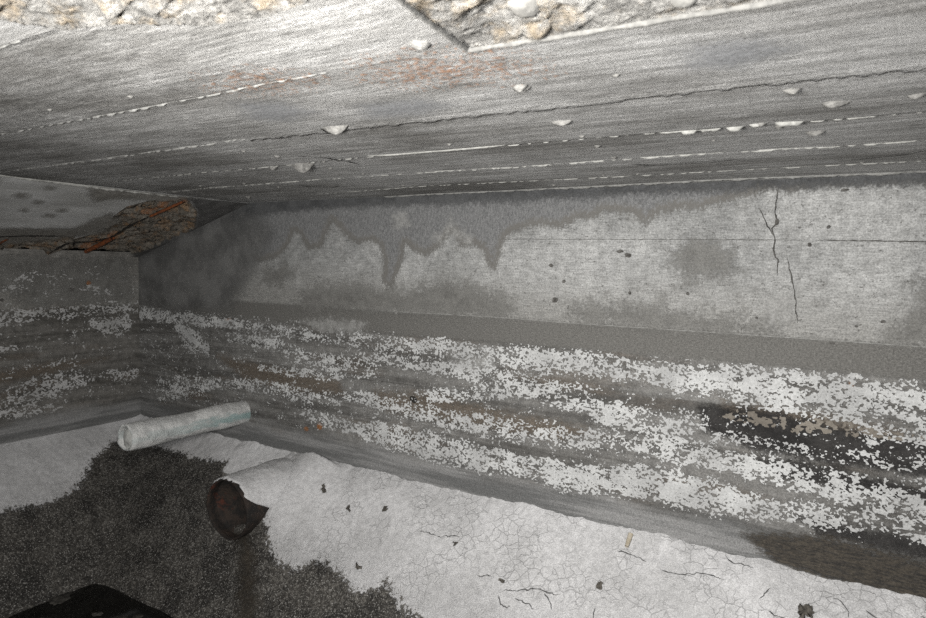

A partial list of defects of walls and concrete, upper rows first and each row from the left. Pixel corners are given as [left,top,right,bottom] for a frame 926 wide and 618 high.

spalling [0,0,312,30]
spalling [396,0,799,53]
spalling [0,199,197,255]
damp [0,173,926,381]
crack [508,191,798,320]
crack [828,237,926,245]
peeling [0,266,926,546]
damp [698,404,926,499]
damp [0,439,423,618]
crack [477,574,558,609]
crack [619,550,752,580]